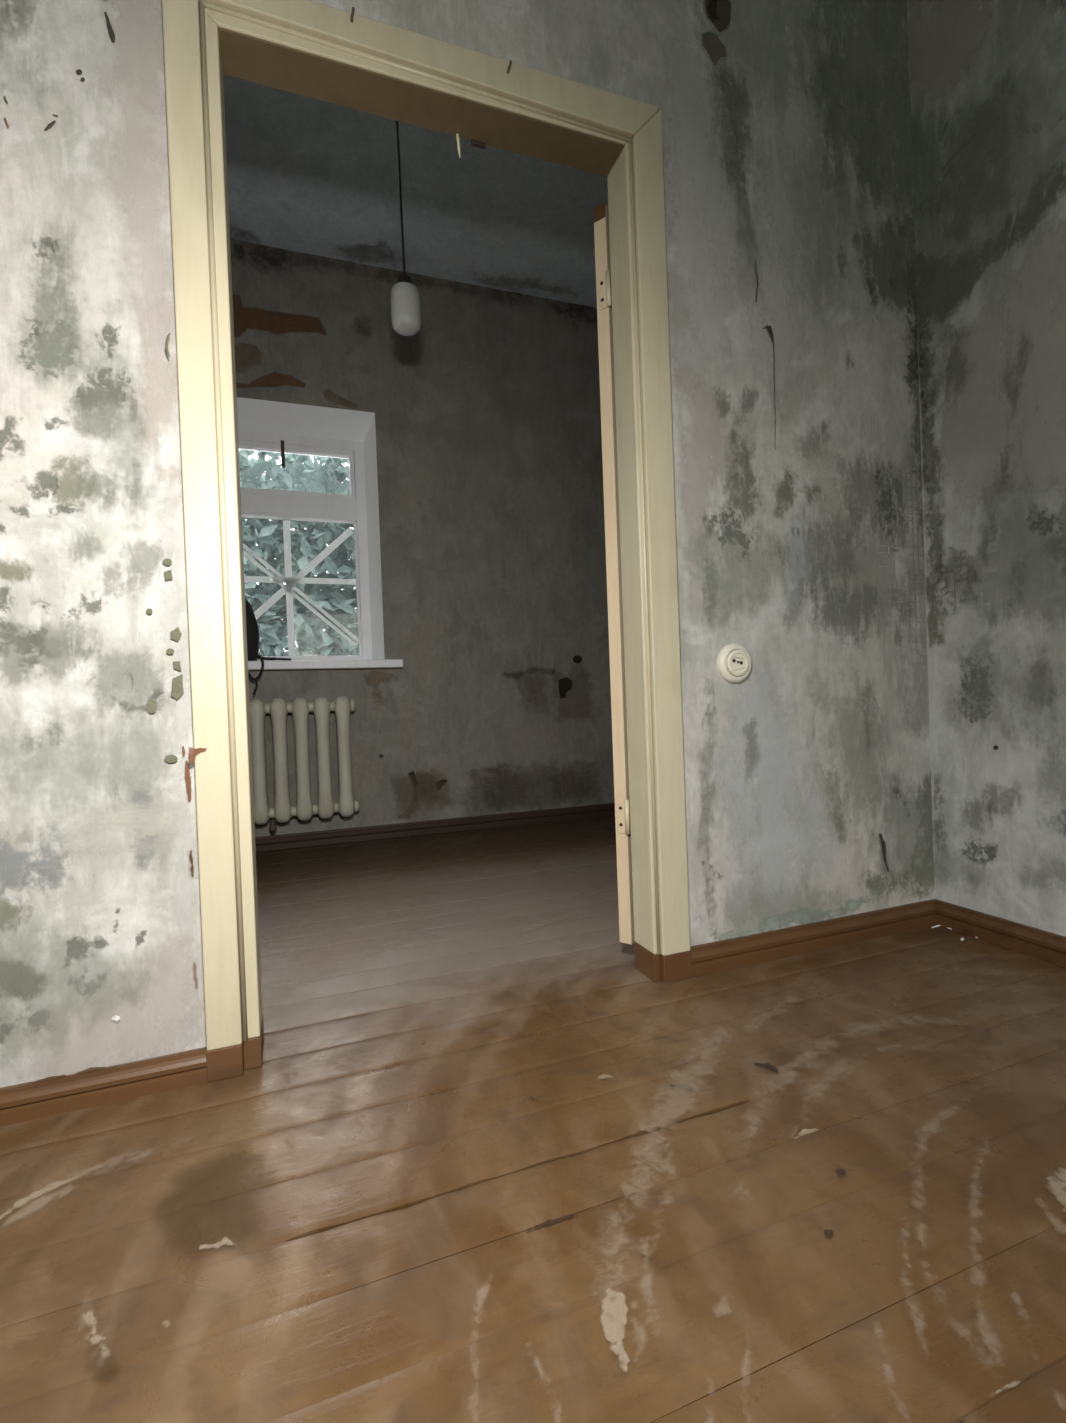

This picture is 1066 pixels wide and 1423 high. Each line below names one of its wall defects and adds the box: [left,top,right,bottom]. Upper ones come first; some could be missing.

leakage [0,418,23,457]
leakage [77,325,130,407]
flaking render [232,294,327,390]
flaking render [322,389,359,409]
leakage [855,163,1066,643]
leakage [12,459,96,516]
leakage [705,433,755,559]
leakage [0,562,49,664]
leakage [80,596,101,612]
leakage [0,834,62,929]
leakage [66,909,120,996]
leakage [0,961,50,1043]